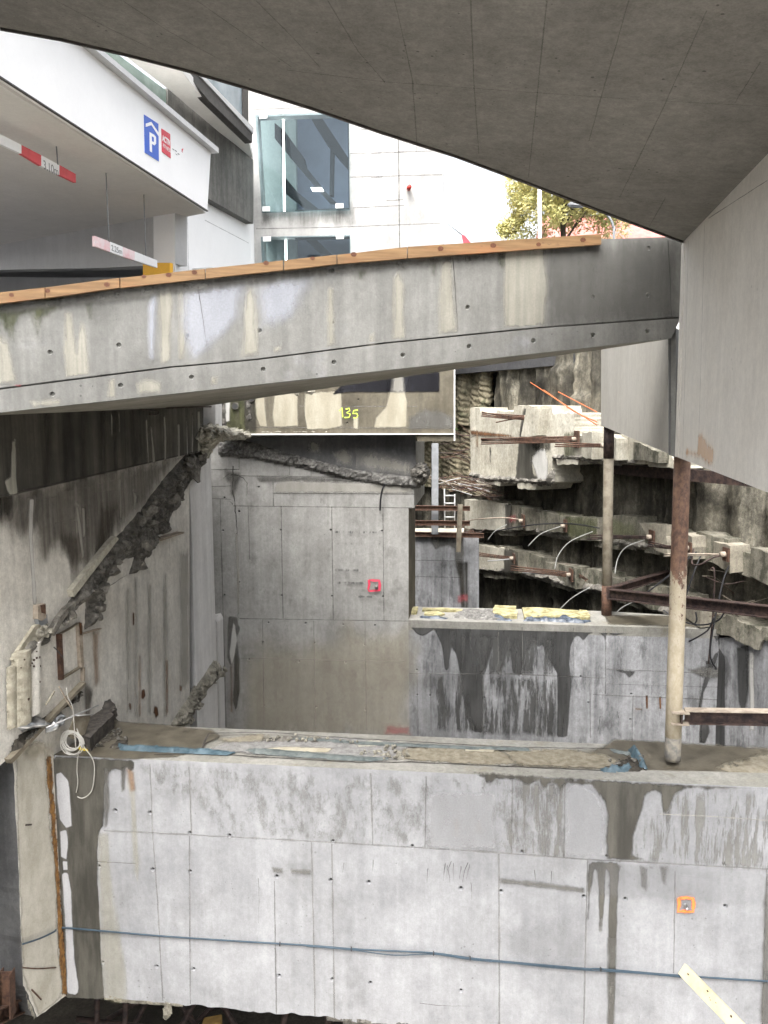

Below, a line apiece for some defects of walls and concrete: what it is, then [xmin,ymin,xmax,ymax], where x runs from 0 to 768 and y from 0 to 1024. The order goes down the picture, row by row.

spalling [35,401,643,658]
spalling [613,539,655,551]
spalling [629,602,669,615]
spalling [171,660,228,726]
leakage [412,615,669,737]
leakage [691,635,754,708]
leakage [586,725,768,773]
leakage [53,585,220,999]
leakage [479,763,724,1024]